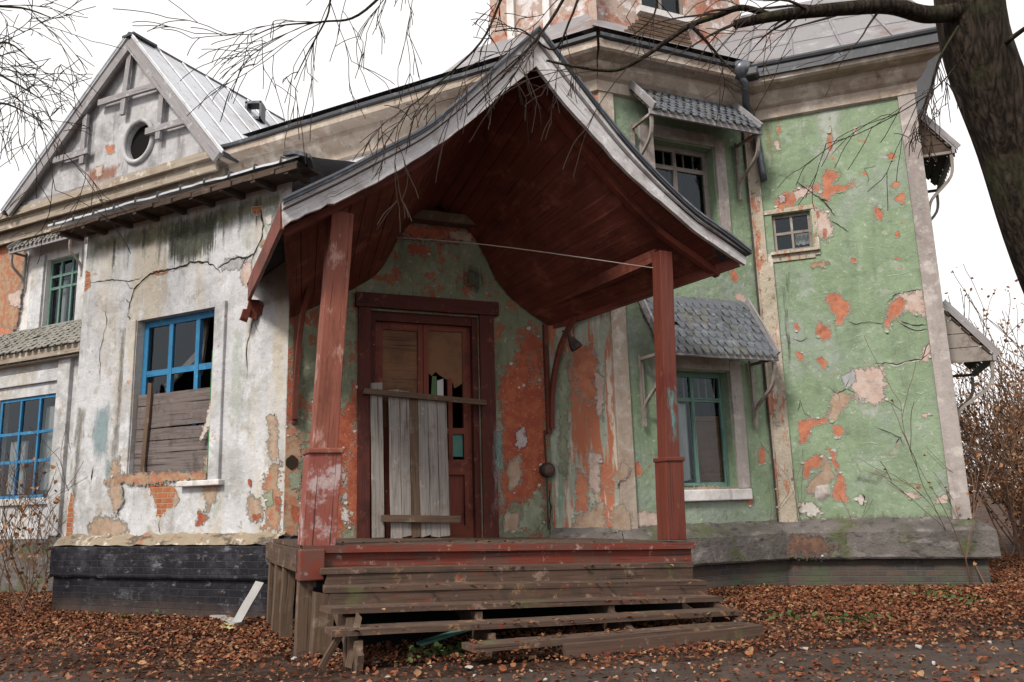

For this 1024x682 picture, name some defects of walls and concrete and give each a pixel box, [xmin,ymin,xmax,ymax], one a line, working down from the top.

peeling [0,243,25,344]
crack [90,208,265,385]
water stain [158,215,224,262]
peeling [774,167,858,243]
crack [849,289,930,367]
peeling [86,455,130,536]
flaking render [148,480,187,519]
peeling [194,401,221,527]
spalling [245,347,313,536]
peeling [336,380,358,538]
peeling [494,324,549,534]
peeling [796,390,867,520]